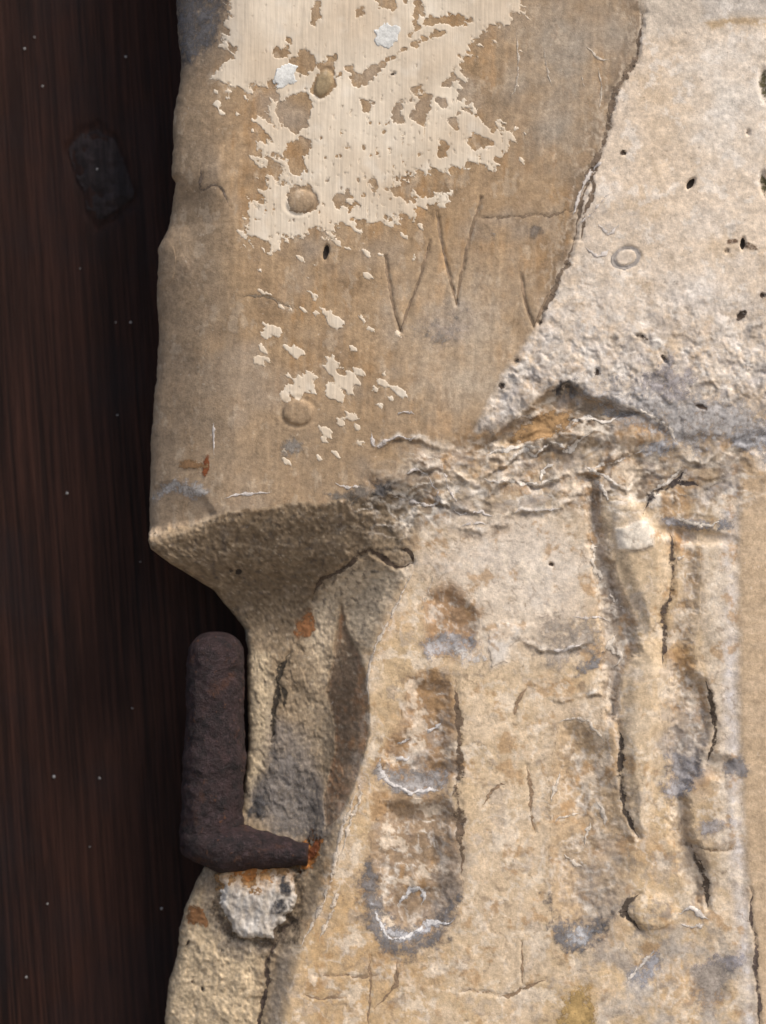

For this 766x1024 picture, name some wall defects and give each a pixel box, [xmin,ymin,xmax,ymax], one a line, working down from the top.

peeling [209,0,530,278]
crack [482,14,643,321]
peeling [253,322,305,367]
peeling [258,289,345,330]
peeling [279,354,408,461]
corrosion [179,455,209,477]
corrosion [293,608,315,637]
crack [660,535,676,663]
crack [270,654,289,743]
crack [453,688,536,873]
crack [617,723,639,837]
corrosion [214,830,324,895]